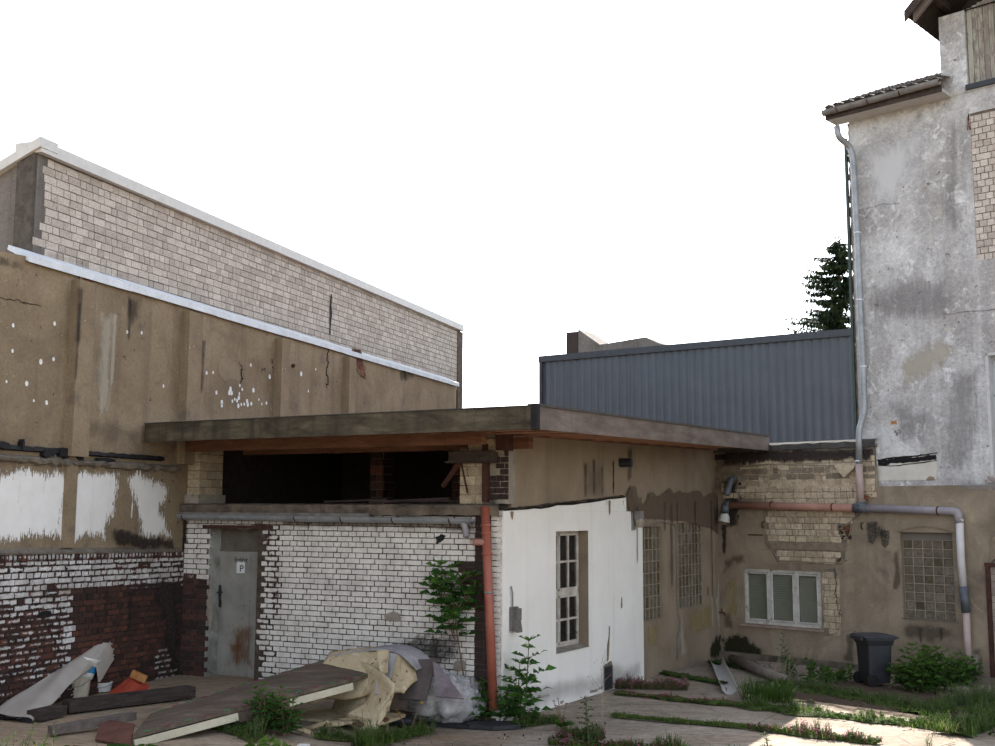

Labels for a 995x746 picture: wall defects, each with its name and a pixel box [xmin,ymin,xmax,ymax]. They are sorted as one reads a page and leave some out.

leakage [100,315,116,409]
crack [325,294,333,387]
peeling [0,466,64,544]
peeling [75,470,172,541]
spalling [720,456,937,636]